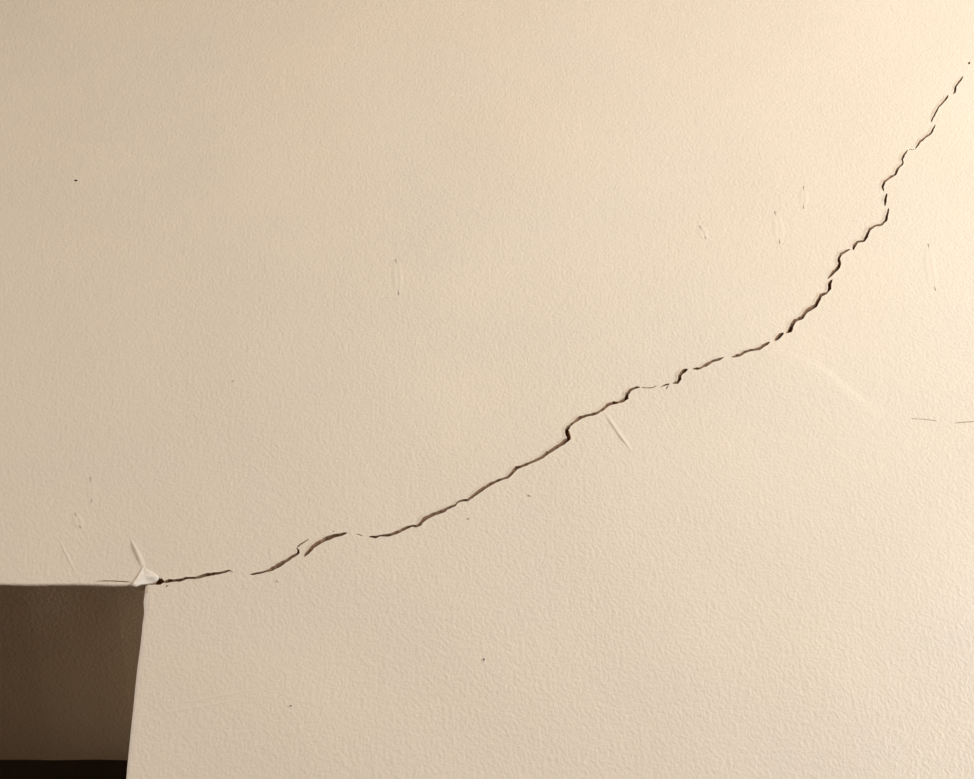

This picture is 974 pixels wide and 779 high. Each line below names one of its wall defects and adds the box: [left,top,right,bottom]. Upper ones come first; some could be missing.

crack [151,62,970,587]